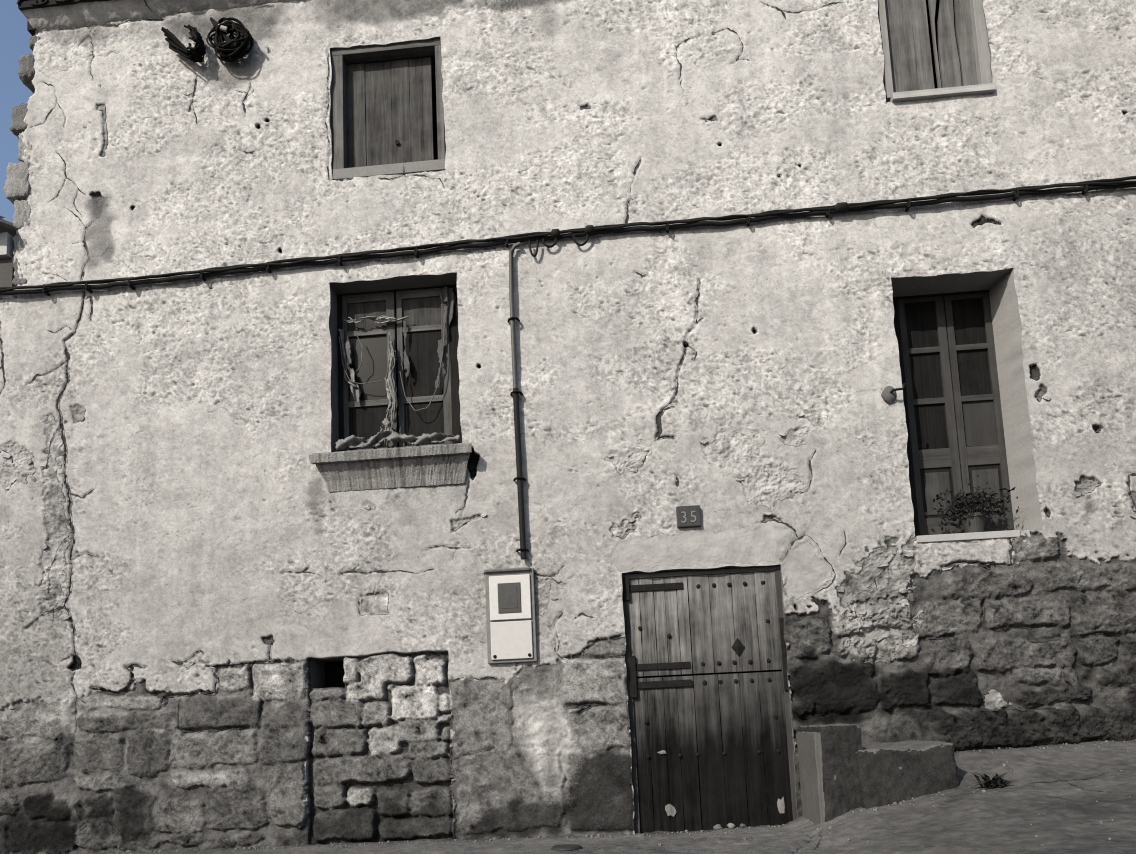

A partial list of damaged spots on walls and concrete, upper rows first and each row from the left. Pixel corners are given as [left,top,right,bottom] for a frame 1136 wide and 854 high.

crack [676,28,748,85]
damp [86,198,113,266]
crack [0,76,294,733]
crack [641,280,703,466]
flaking render [835,535,924,665]
crack [767,518,1013,625]